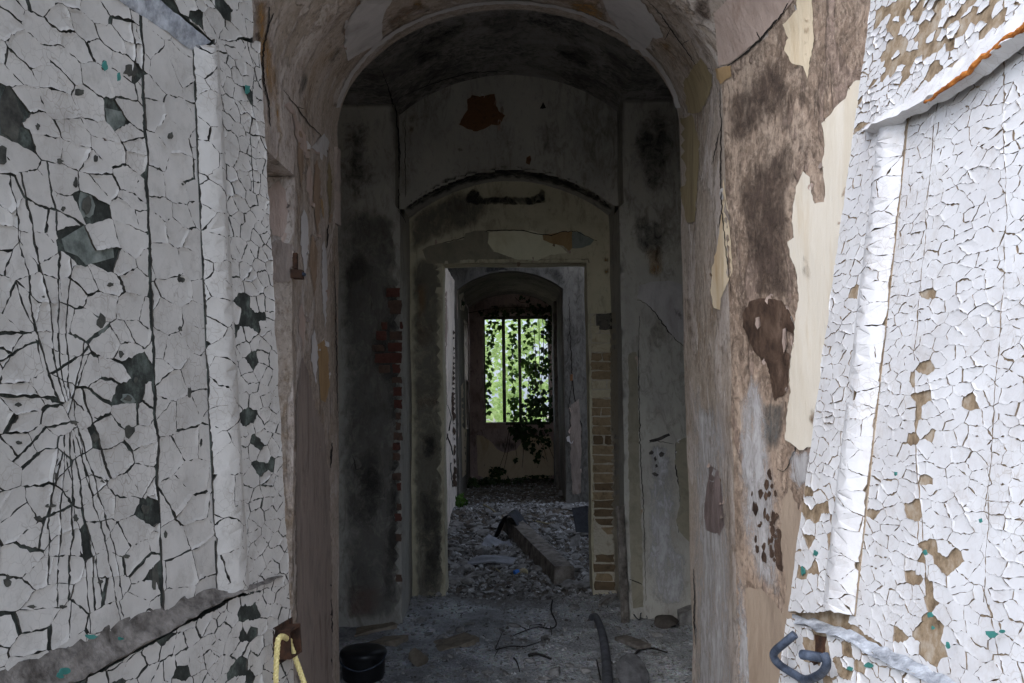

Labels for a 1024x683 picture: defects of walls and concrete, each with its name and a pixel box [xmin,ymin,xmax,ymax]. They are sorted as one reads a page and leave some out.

flaking render [459,94,505,131]
water stain [733,64,786,138]
flaking render [783,0,814,77]
corrosion [923,22,1024,104]
flaking render [423,231,594,267]
flaking render [710,179,733,310]
water stain [742,150,786,294]
flaking render [742,80,860,450]
flaking render [372,288,403,559]
flaking render [567,312,620,593]
flaking render [704,463,726,536]
flaking render [745,468,806,683]